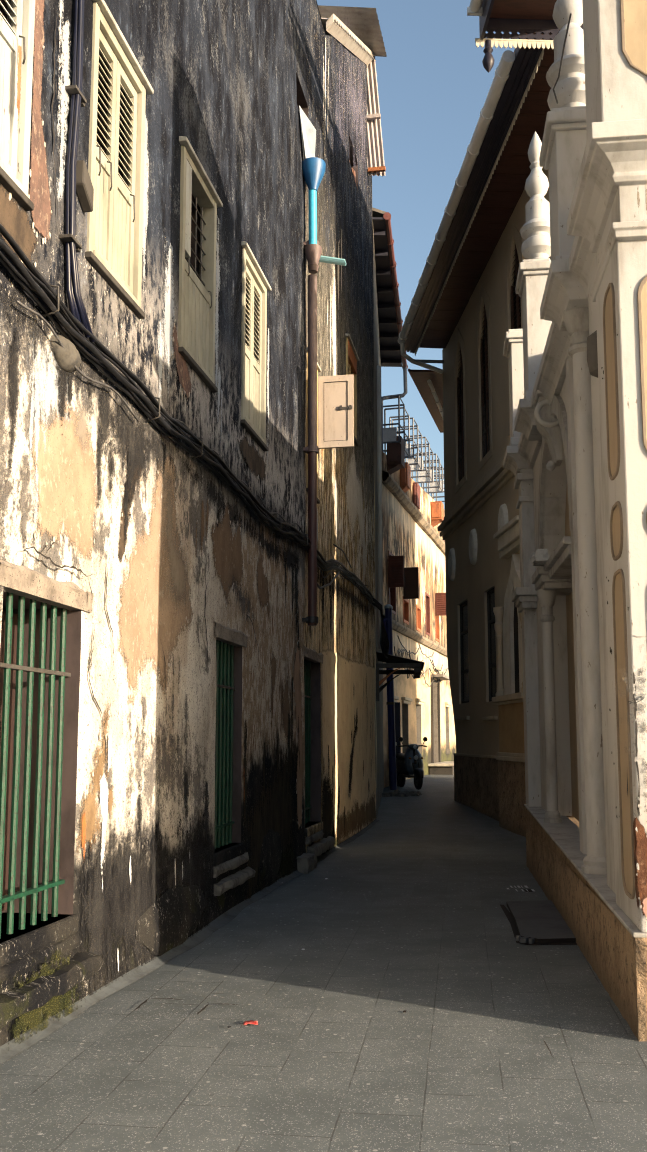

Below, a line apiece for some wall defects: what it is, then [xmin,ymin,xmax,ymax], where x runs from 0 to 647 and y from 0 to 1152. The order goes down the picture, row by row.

flaking render [0,0,52,267]
flaking render [28,398,98,560]
crack [24,534,114,762]
damp [73,700,214,1006]
damp [171,657,189,753]
flaking render [116,453,269,705]
damp [244,677,300,900]